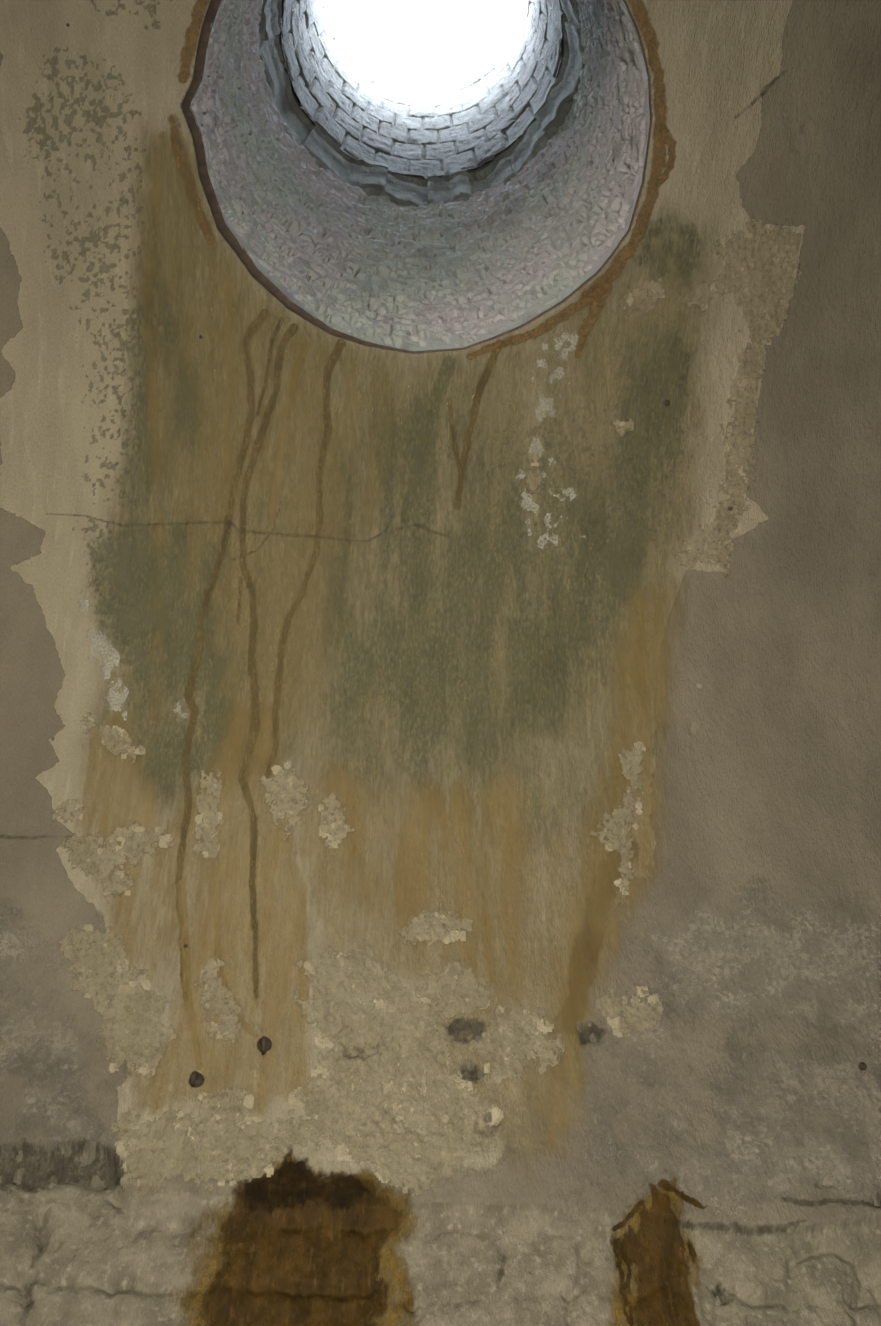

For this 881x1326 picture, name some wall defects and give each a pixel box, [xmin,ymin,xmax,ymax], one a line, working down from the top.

rust [178,0,209,83]
rust [169,116,215,244]
rust [467,0,676,359]
peeling [249,319,288,414]
damp [56,133,703,1147]
peeling [577,986,664,1044]
spalling [0,1140,131,1192]
peeling [287,1132,380,1180]